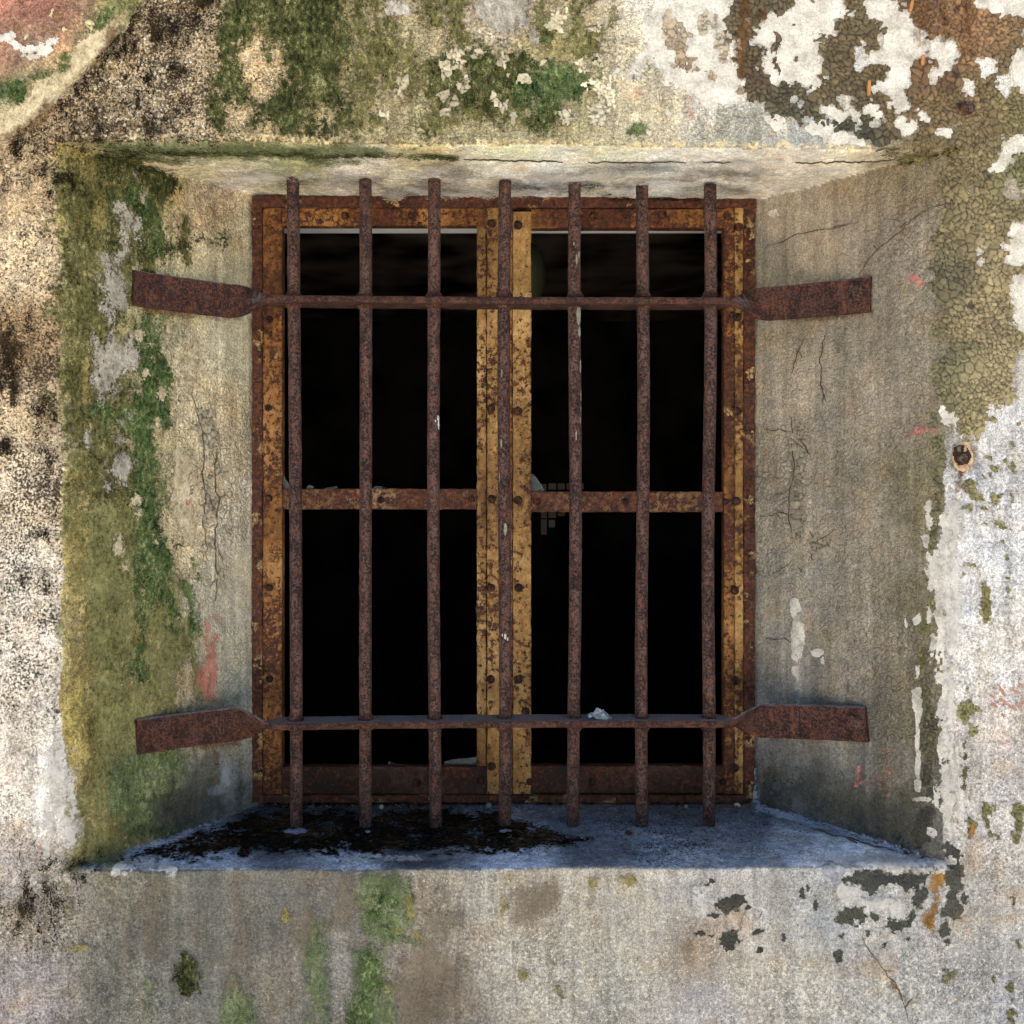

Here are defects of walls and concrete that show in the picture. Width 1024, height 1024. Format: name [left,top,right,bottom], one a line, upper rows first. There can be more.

crack [765,222,859,248]
crack [862,203,987,270]
water stain [79,344,92,405]
water stain [153,349,173,430]
crack [791,335,826,403]
peeling [557,0,1024,964]
crack [759,416,833,574]
water stain [130,585,146,657]
water stain [166,557,203,703]
water stain [371,853,423,862]
water stain [752,768,947,875]
peeling [991,976,1018,1024]